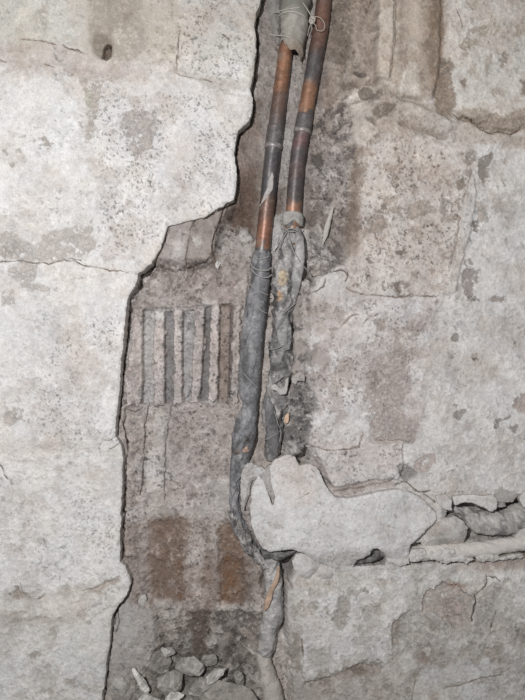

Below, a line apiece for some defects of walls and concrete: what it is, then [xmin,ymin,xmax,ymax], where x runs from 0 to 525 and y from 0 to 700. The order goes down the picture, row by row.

crack [455,116,517,135]
crack [0,258,86,267]
peeling [435,486,525,512]
spalling [89,562,132,596]